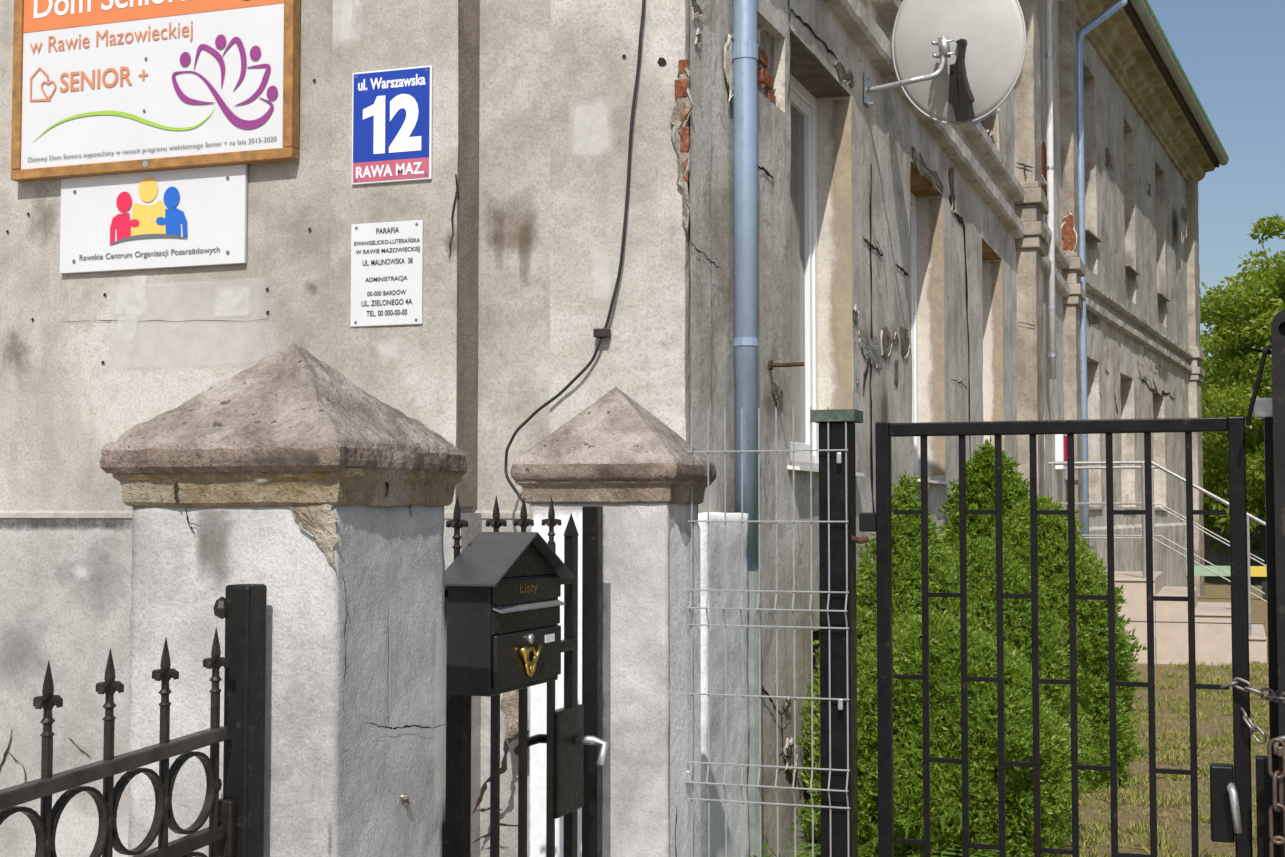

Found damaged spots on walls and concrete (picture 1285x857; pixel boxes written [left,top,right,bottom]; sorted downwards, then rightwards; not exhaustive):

flaking render [757,27,776,105]
flaking render [670,0,703,232]
peeling [831,60,859,409]
flaking render [1061,211,1077,253]
spalling [880,326,910,387]
spalling [288,503,339,569]
crack [370,716,447,730]